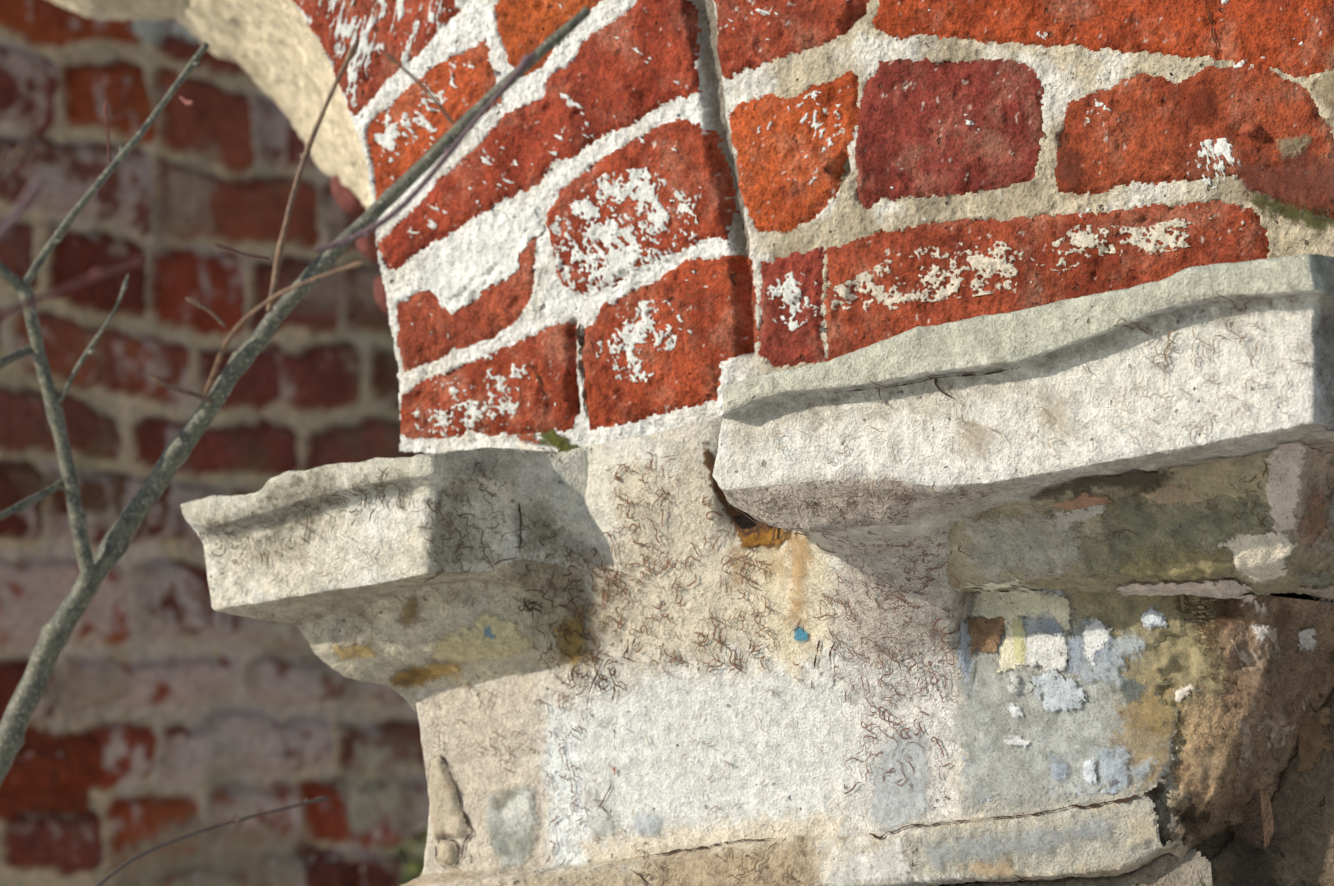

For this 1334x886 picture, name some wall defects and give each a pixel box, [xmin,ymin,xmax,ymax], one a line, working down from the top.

crack [575,324,588,418]
crack [1079,293,1334,550]
crack [185,362,1151,886]
spalling [942,442,1334,858]
peeling [827,730,1110,886]
water stain [1169,789,1211,842]
crack [1196,831,1236,886]
crack [1270,687,1334,803]